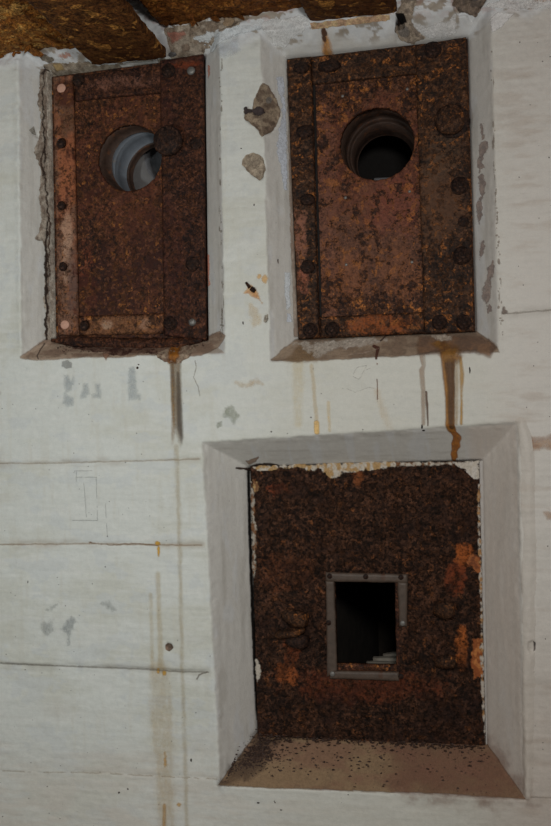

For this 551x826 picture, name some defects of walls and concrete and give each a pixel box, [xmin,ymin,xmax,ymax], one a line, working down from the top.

spalling [40,0,551,77]
peeling [476,124,494,221]
peeling [482,235,502,313]
rust [51,335,203,437]
rust [434,341,464,461]